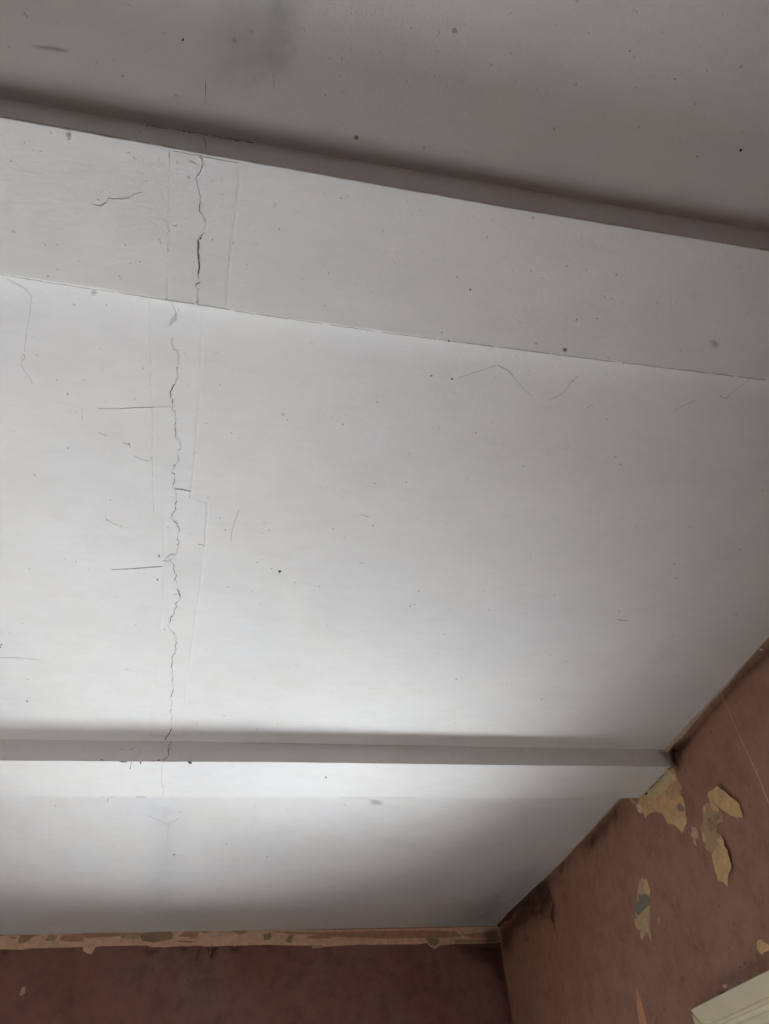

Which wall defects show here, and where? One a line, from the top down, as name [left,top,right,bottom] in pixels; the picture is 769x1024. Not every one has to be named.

crack [82,125,254,760]
flaking render [630,768,743,887]
peeling [0,926,500,954]
peeling [633,877,661,942]
peeling [757,940,769,954]